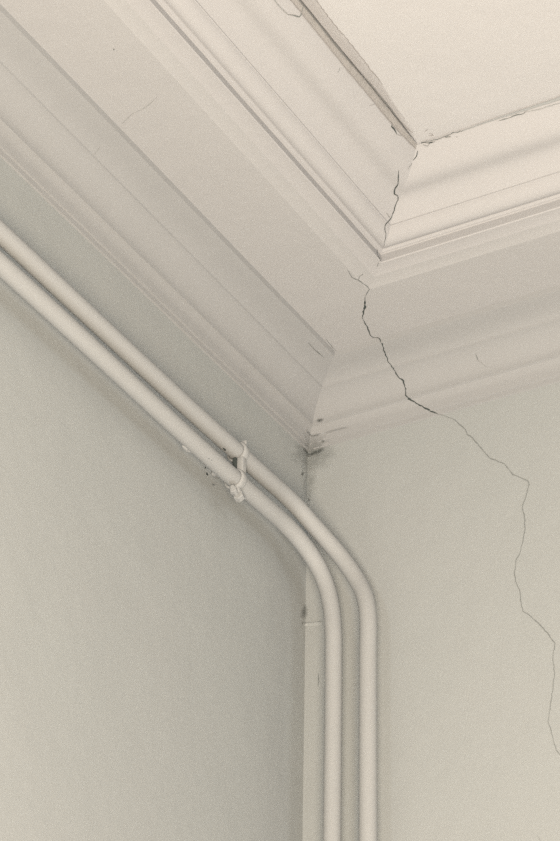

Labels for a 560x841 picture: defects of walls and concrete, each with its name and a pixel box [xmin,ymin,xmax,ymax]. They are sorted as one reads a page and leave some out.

spalling [274,0,417,149]
crack [348,97,560,754]